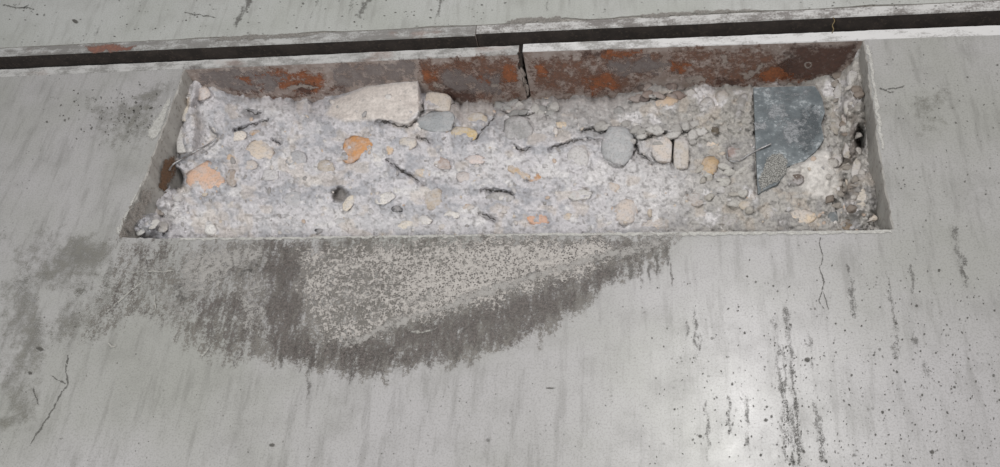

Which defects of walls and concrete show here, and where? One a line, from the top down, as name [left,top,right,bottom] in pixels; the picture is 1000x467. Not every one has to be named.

rust [230,67,343,99]
crack [501,52,546,116]
rust [419,44,856,103]
spalling [116,45,892,241]
crack [819,237,829,309]
damp [81,232,673,394]
crack [30,357,69,444]